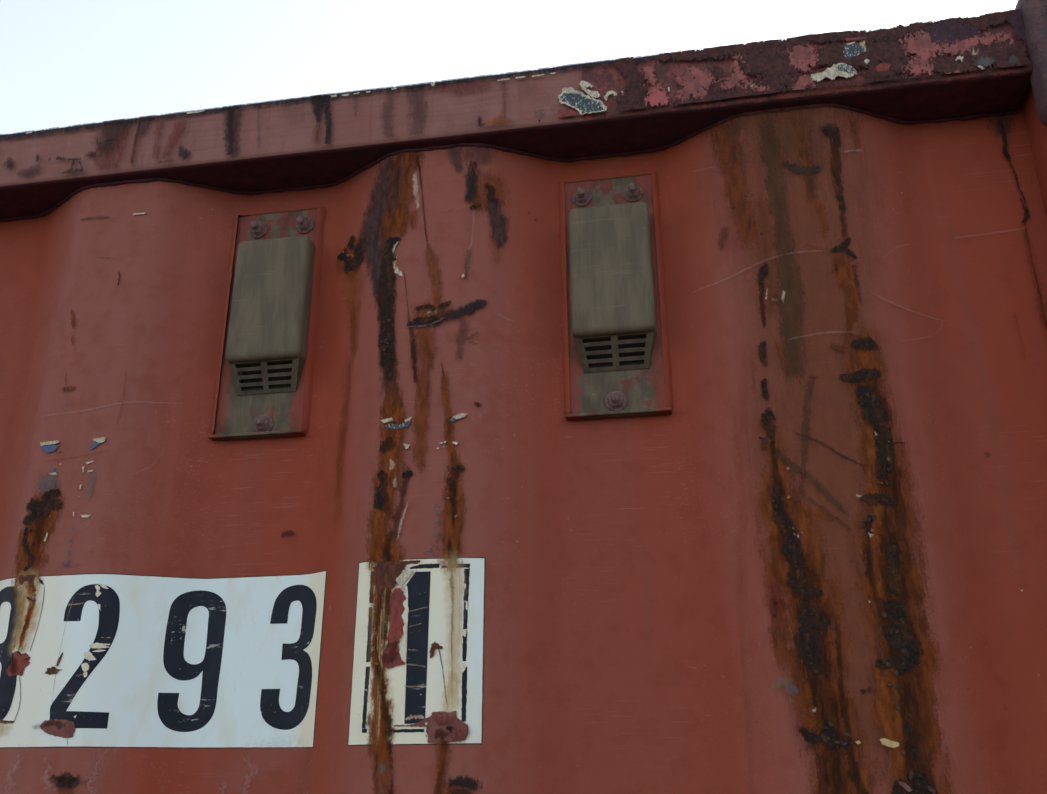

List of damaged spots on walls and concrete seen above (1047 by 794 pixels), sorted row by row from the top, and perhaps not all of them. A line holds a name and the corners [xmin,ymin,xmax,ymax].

peeling [784,29,1014,90]
crack [992,112,1047,330]
rust [11,472,65,650]
peeling [40,440,61,473]
rust [336,151,441,794]
peeling [381,570,417,668]
rust [437,365,467,658]
rust [758,123,952,794]
rust [51,772,80,789]
peeling [394,642,469,794]
rust [444,776,482,794]